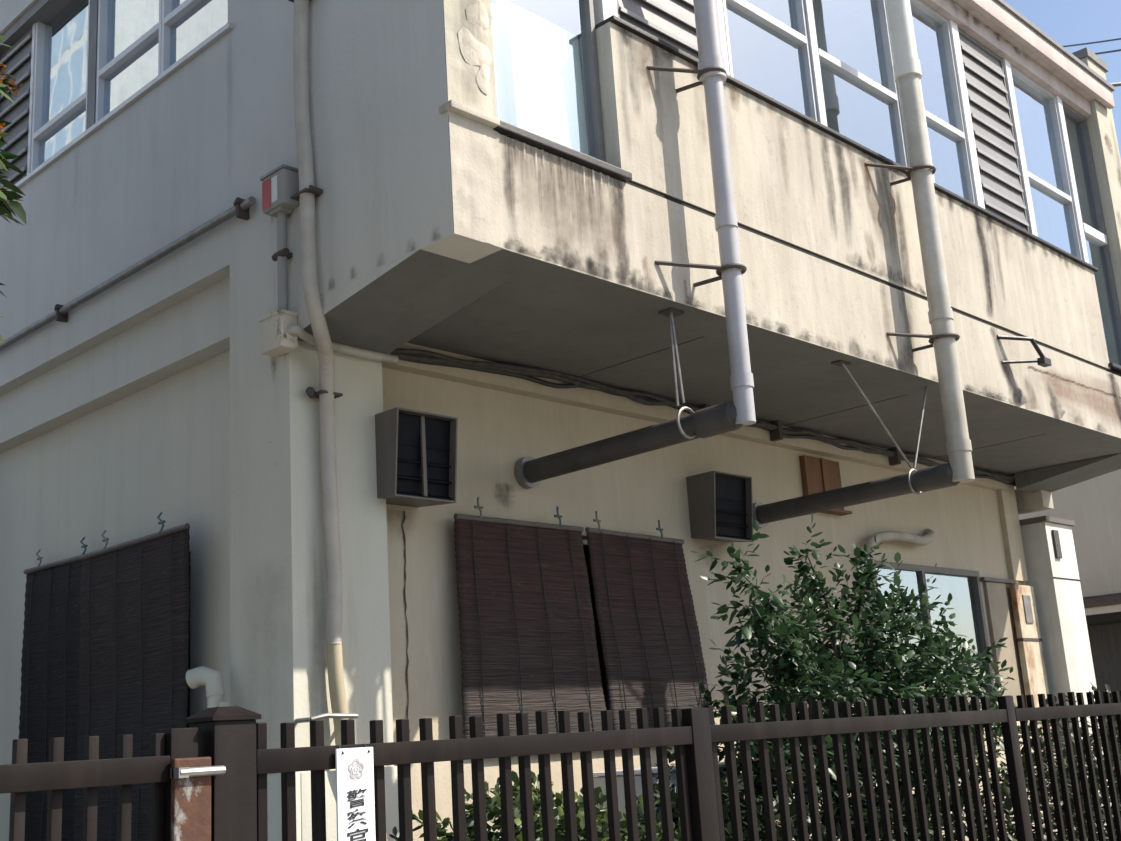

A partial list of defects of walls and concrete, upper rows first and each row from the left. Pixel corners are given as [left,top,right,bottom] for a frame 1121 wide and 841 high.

leakage [506,141,668,297]
leakage [839,146,850,209]
leakage [940,192,992,311]
leakage [1001,361,1025,407]